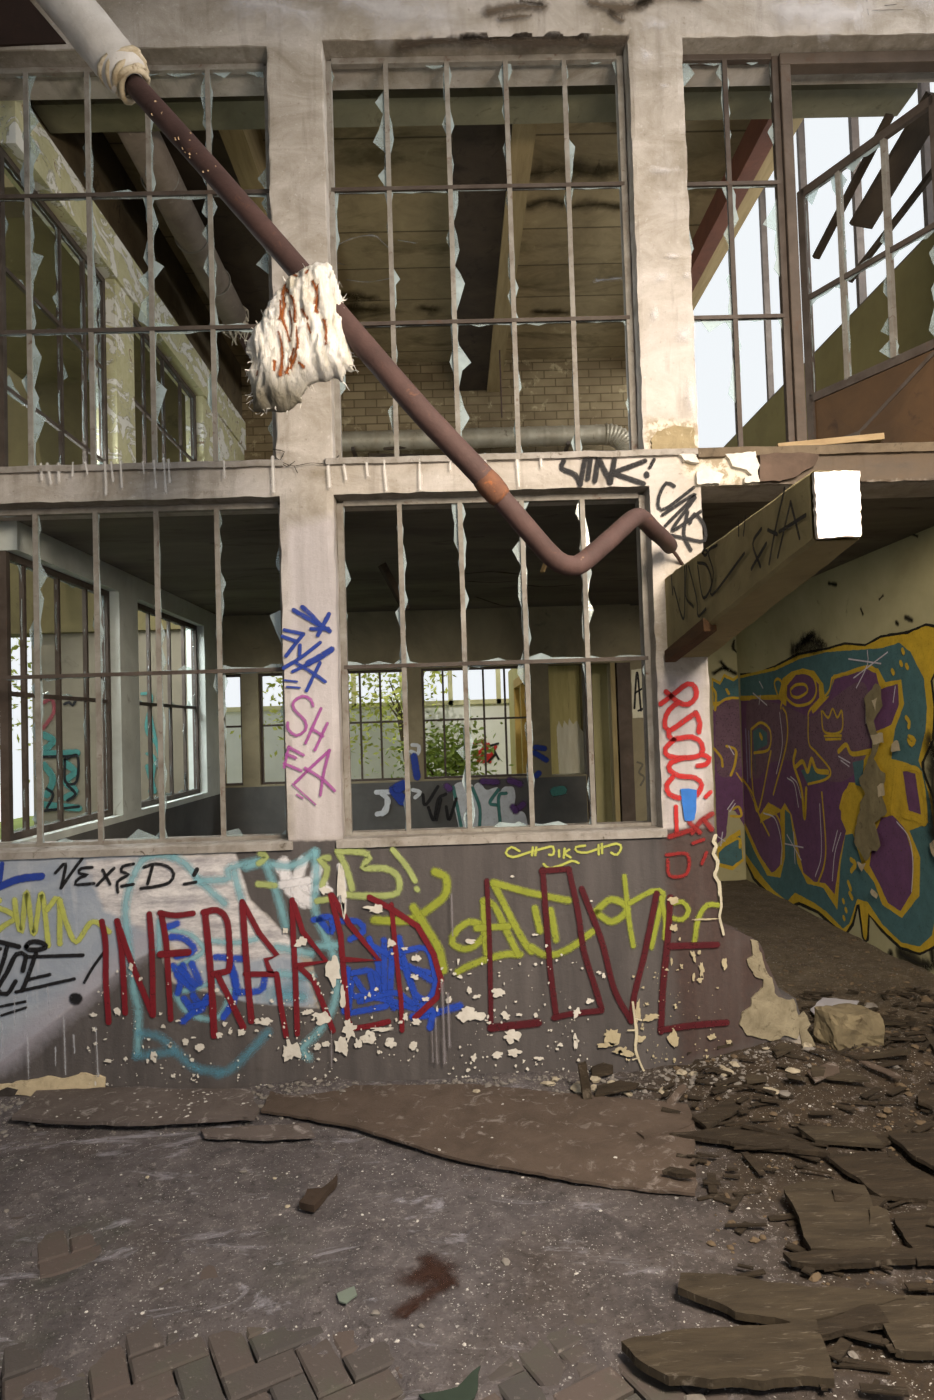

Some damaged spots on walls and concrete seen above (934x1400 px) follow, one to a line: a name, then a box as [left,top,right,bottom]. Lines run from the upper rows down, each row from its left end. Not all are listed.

peeling [650,425,760,486]
peeling [870,733,900,752]
peeling [318,865,383,919]
peeling [283,928,307,947]
flaking render [387,834,815,1079]
peeling [0,955,421,1097]